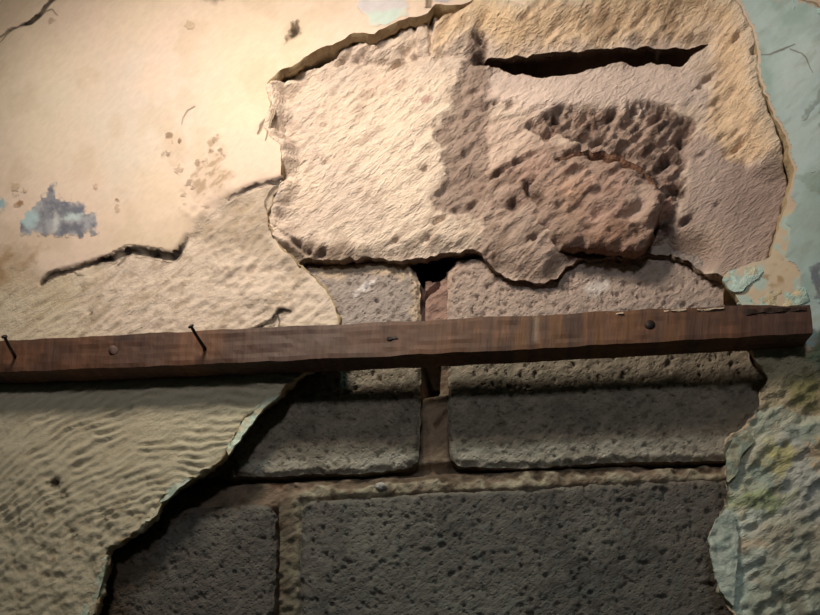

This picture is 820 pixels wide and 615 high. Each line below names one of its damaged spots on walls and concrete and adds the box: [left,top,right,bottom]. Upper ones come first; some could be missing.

crack [0,0,58,42]
spalling [263,0,820,348]
peeling [16,181,100,239]
crack [40,236,189,286]
spalling [74,350,820,615]